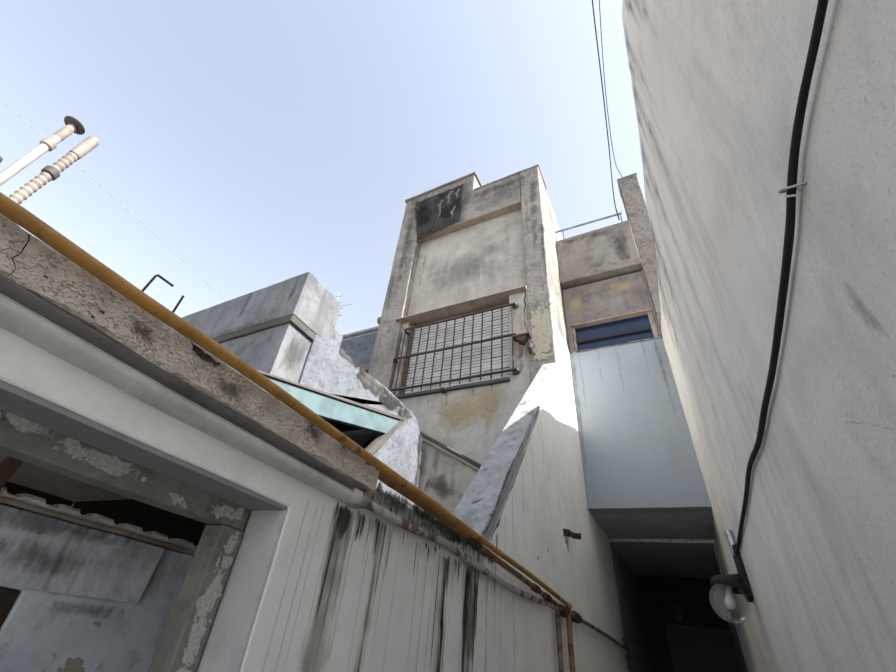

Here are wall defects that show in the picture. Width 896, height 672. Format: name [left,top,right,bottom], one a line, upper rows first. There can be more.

crack [0,234,30,277]
damp [403,184,463,259]
spalling [191,341,224,367]
peeling [531,302,554,361]
peeling [0,409,147,482]
peeling [176,504,245,672]
damp [316,503,392,644]
damp [368,481,495,672]
peeling [42,653,100,672]